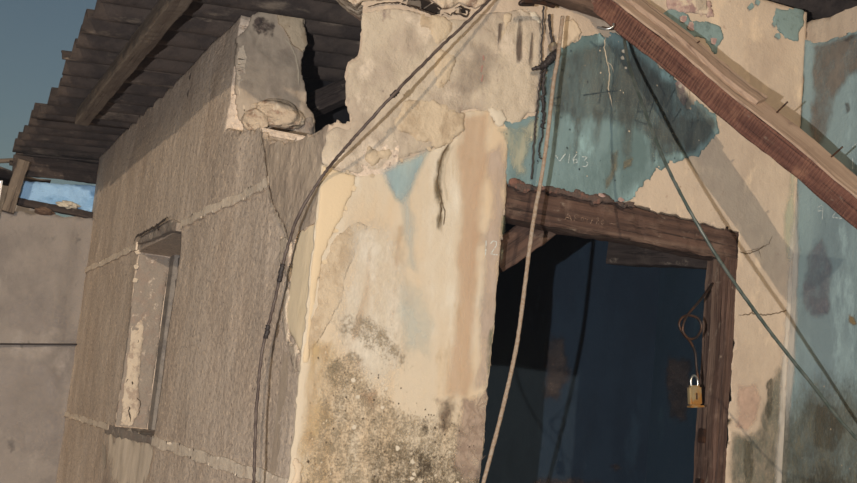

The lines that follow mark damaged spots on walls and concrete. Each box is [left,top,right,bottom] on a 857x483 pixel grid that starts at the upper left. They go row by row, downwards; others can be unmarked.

flaking render [675,81,690,100]
peeling [663,0,724,54]
leakage [811,39,857,143]
flaking render [259,8,635,397]
peeling [102,317,153,483]
leakage [344,318,403,362]
leakage [306,353,479,483]
leakage [732,174,857,483]